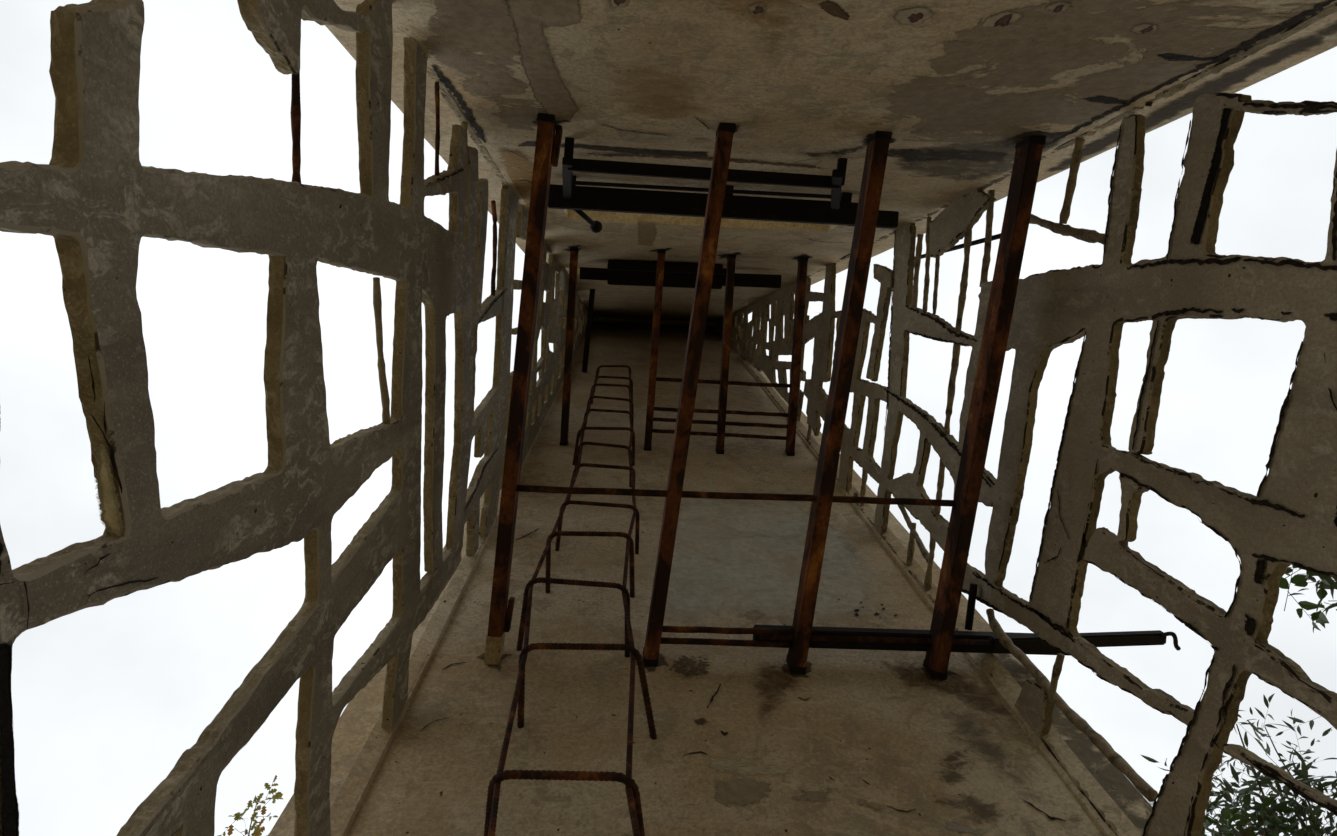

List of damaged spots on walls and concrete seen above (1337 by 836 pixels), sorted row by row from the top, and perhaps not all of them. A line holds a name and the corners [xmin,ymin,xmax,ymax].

peeling [869,0,1317,245]
crack [84,553,158,603]
spalling [0,642,19,836]